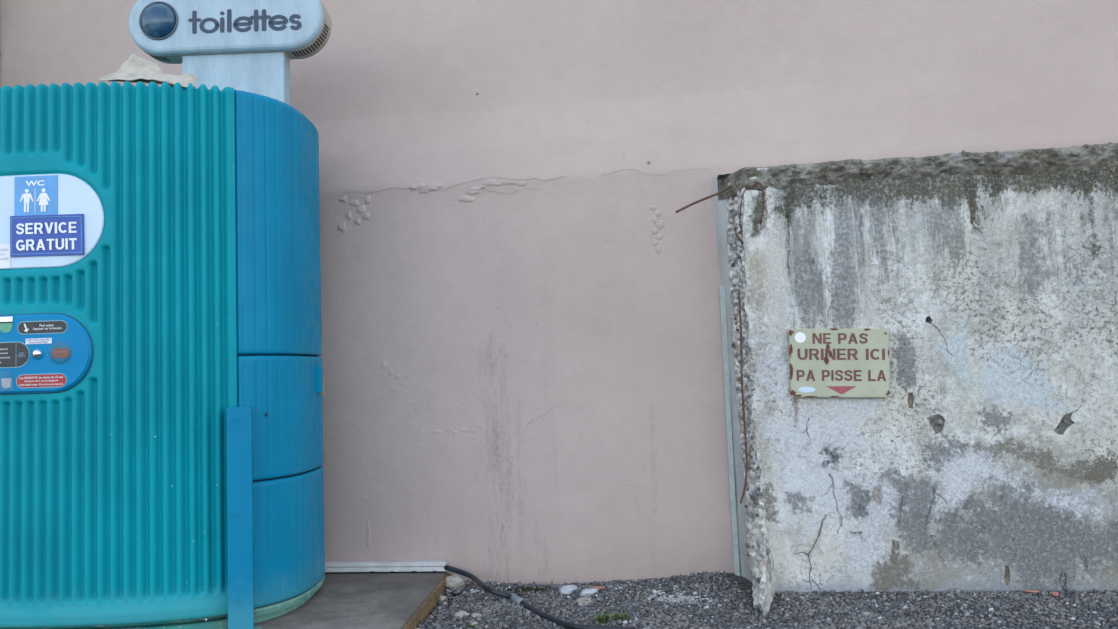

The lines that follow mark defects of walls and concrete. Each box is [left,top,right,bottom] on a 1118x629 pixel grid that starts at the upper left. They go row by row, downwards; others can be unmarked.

damp [749,166,1118,352]
damp [892,333,917,388]
damp [761,482,815,523]
crack [787,419,866,591]
damp [843,480,870,517]
damp [871,405,1118,592]